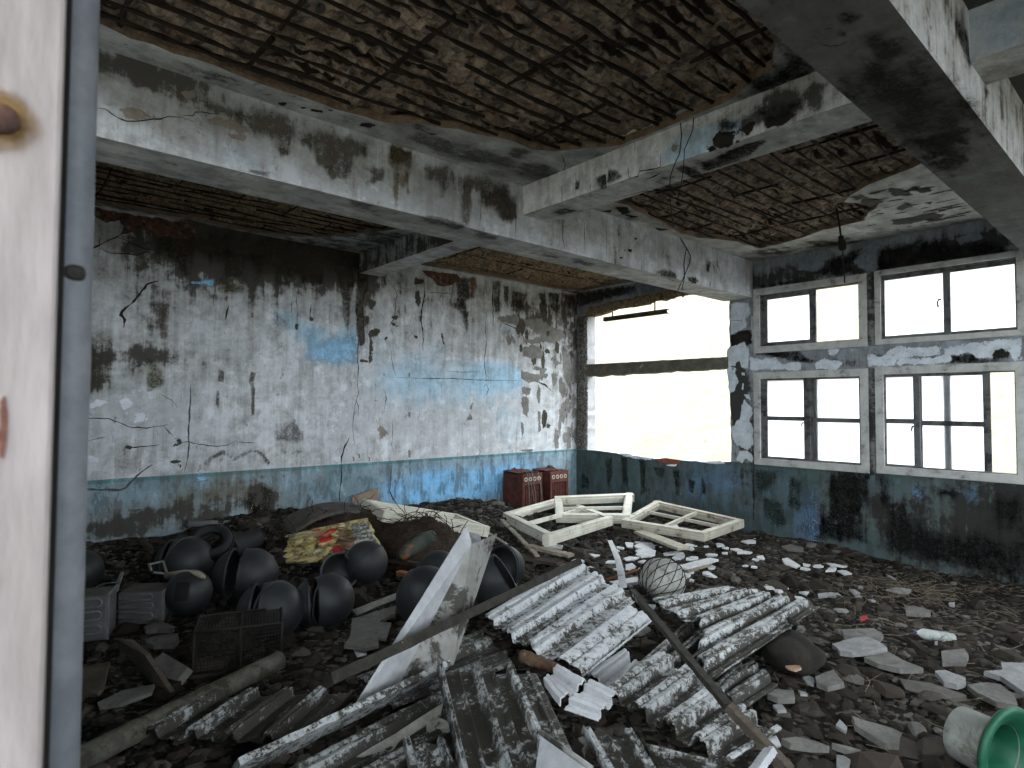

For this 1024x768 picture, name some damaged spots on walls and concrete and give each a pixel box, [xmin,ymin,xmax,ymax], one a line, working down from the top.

spalling [100,0,775,150]
corrosion [0,90,35,149]
spalling [94,161,389,239]
crack [119,281,158,326]
water stain [153,302,169,339]
water stain [158,233,368,345]
water stain [455,278,470,330]
water stain [493,281,526,312]
peeling [497,301,588,452]
peeling [706,302,801,464]
peeling [867,338,1023,367]
crack [87,386,252,512]